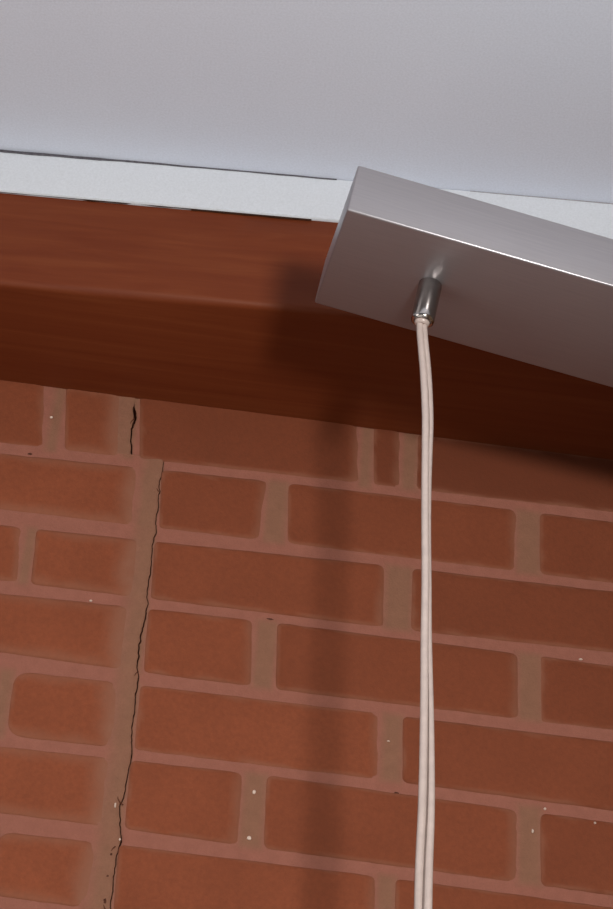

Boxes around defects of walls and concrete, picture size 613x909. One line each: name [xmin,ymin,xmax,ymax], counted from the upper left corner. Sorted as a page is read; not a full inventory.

crack [129,406,137,455]
crack [103,462,164,909]